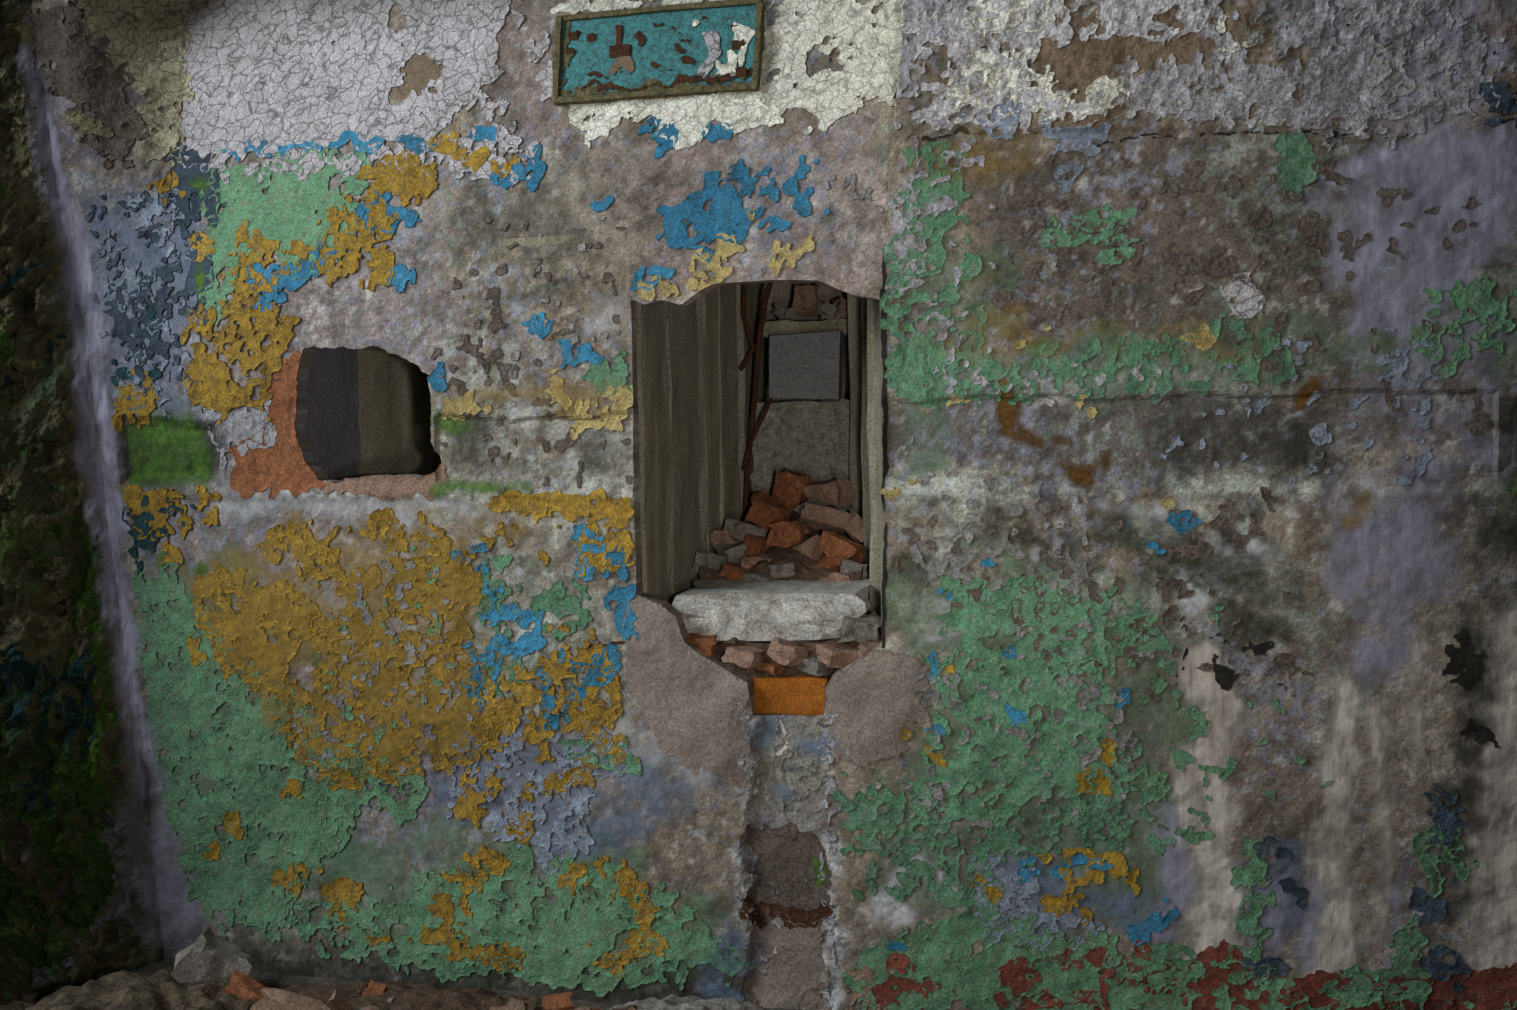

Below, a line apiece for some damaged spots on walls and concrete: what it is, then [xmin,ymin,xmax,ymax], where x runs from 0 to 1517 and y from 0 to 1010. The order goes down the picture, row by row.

leakage [0,0,690,990]
peeling [0,0,753,1010]
peeling [550,0,1517,523]
peeling [730,477,1517,1010]
leakage [1100,509,1404,978]
leakage [1363,640,1429,753]